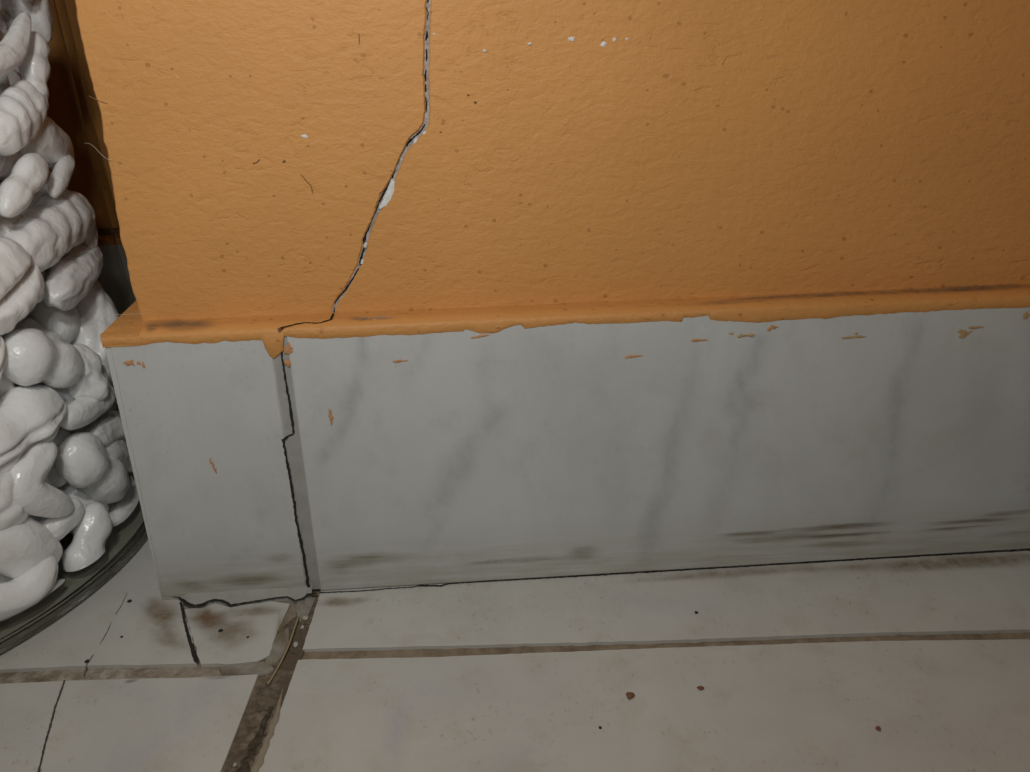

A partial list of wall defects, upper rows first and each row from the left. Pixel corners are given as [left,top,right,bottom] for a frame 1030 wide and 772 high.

crack [174,0,1030,663]
crack [37,594,127,772]